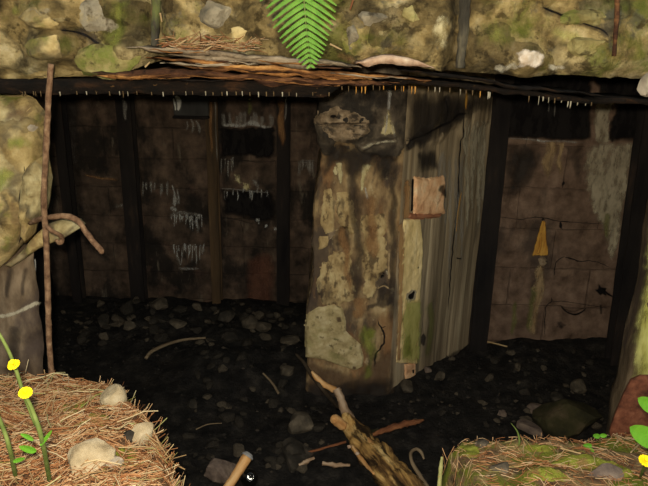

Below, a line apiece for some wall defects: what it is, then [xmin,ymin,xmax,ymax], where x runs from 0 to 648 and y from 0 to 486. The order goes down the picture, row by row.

flaking render [304,175,446,379]
crack [374,321,386,365]
crack [406,96,465,305]
leakage [587,103,632,256]